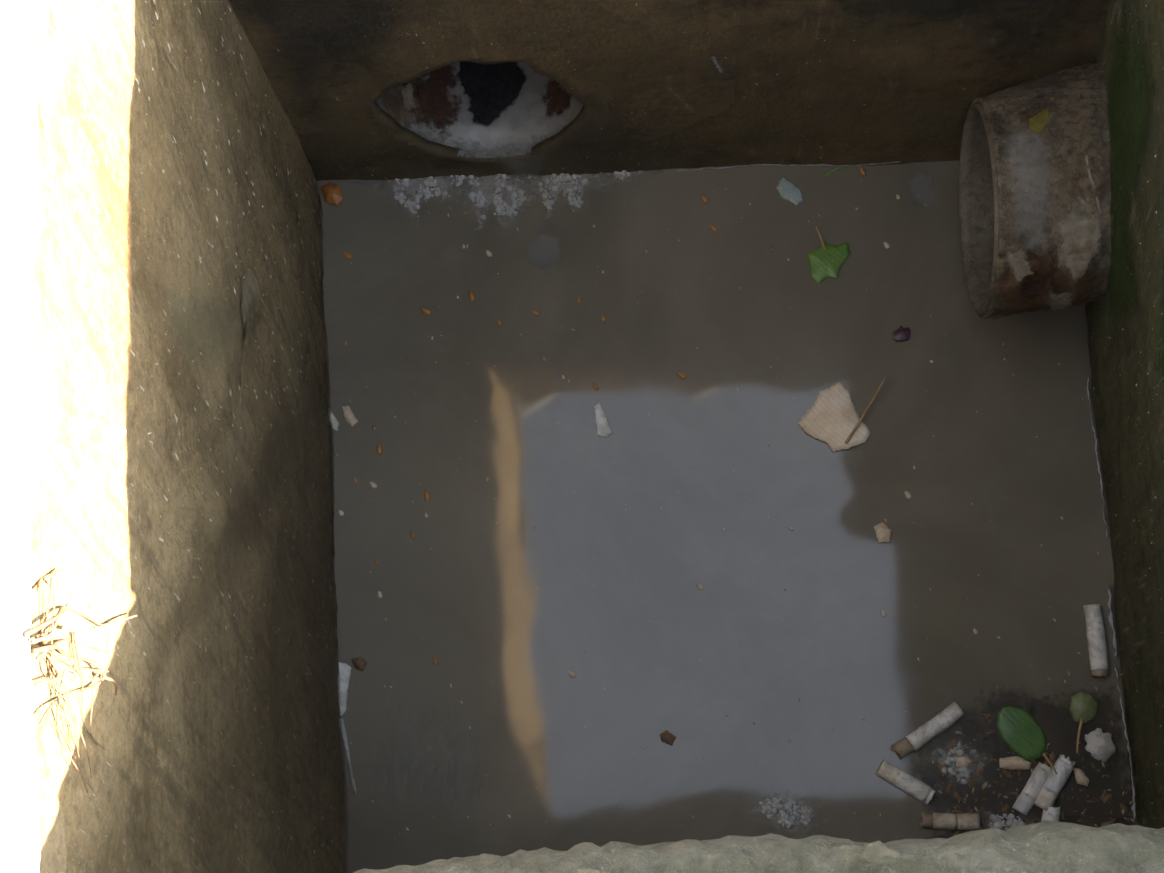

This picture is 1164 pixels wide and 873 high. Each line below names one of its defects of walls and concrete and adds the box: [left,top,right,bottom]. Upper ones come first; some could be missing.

rust [384,66,461,132]
rust [542,80,571,116]
rust [990,257,1099,319]
leakage [1087,378,1107,537]
leakage [1108,587,1136,821]